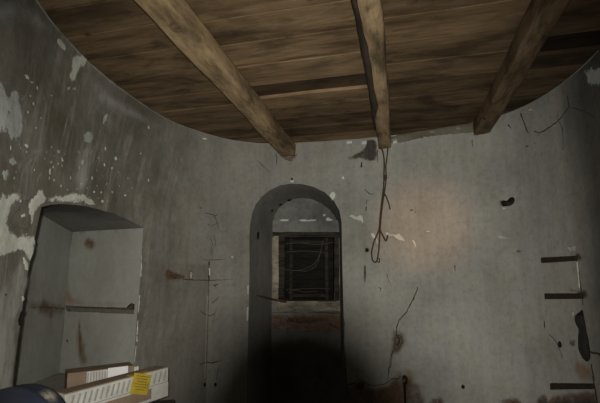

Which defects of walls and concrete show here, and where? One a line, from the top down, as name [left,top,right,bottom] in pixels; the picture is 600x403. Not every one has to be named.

flaking render [67,55,87,90]
flaking render [584,67,600,86]
flaking render [0,81,35,180]
crack [508,97,595,147]
flaking render [0,132,119,389]
flaking render [570,310,600,361]